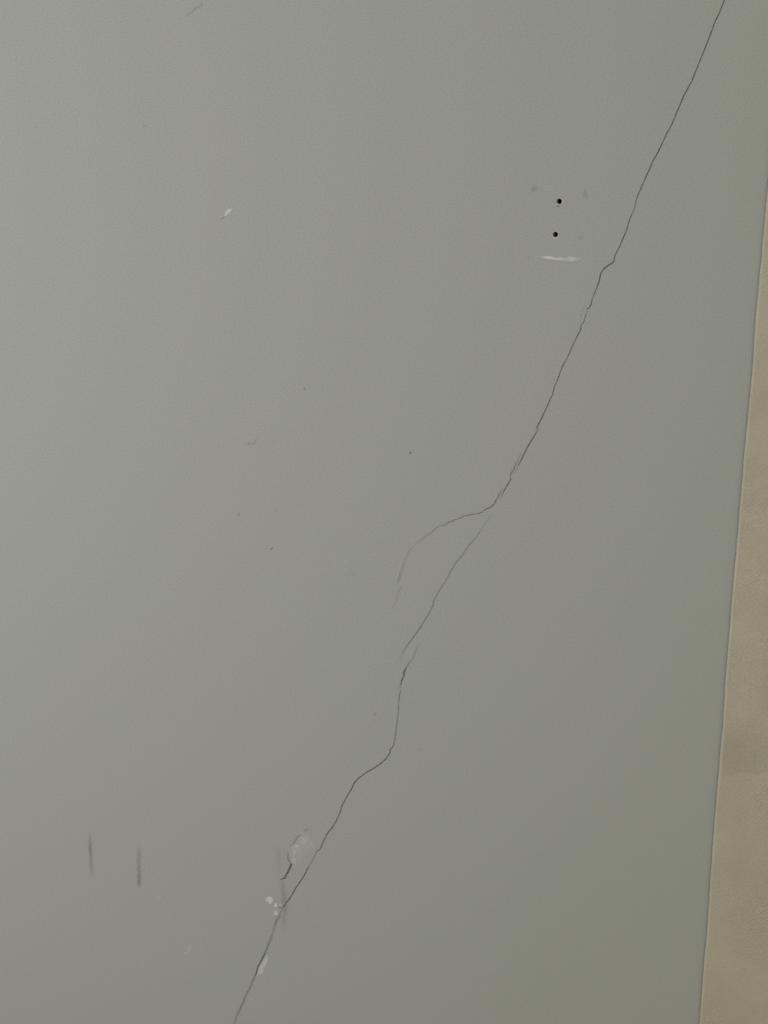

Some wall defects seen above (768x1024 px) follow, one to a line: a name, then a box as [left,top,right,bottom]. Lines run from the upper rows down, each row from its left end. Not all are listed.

crack [233,0,725,1024]